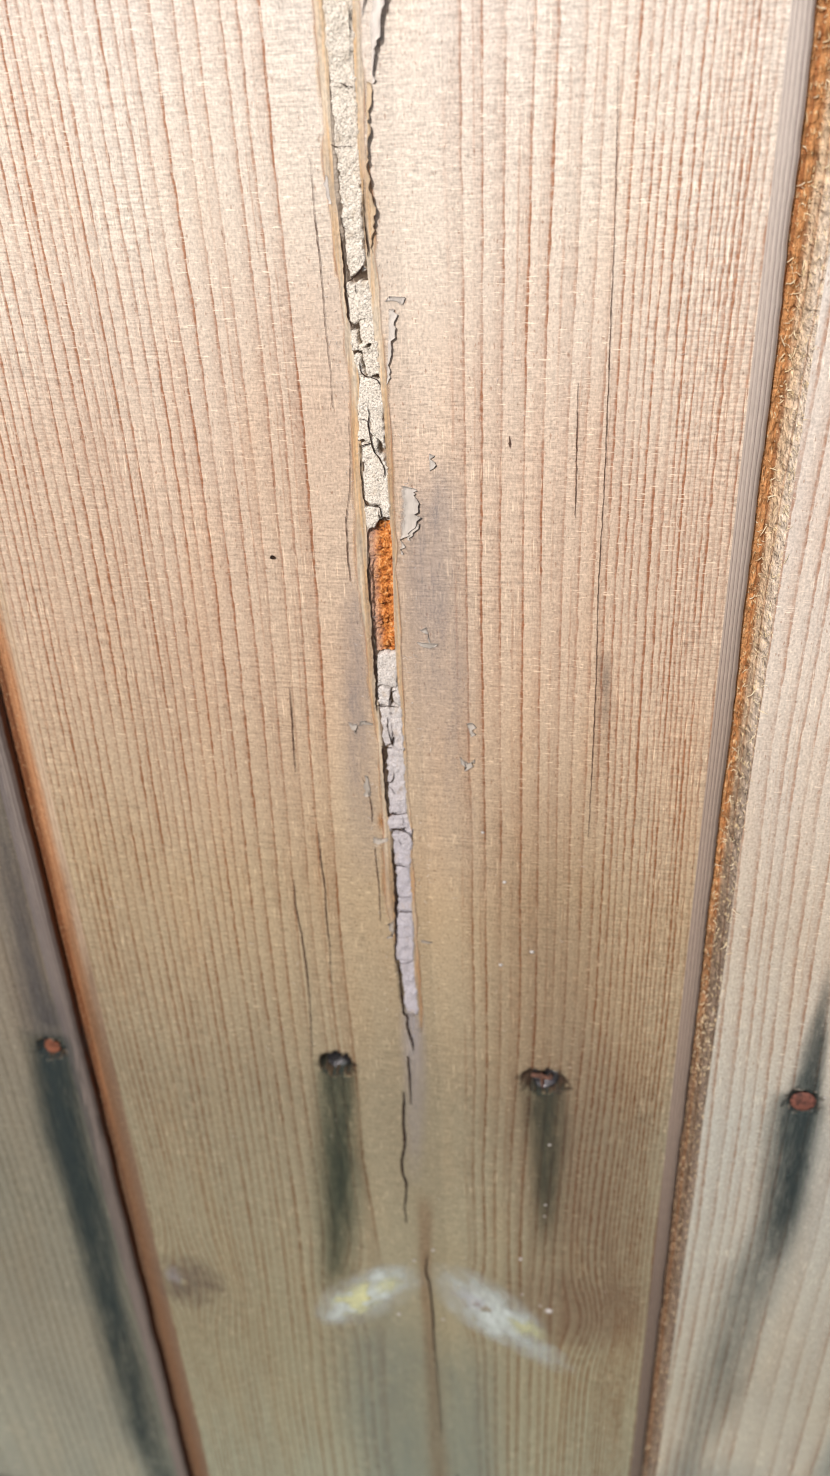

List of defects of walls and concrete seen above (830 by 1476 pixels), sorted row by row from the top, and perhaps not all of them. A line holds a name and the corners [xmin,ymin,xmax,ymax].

crack [304,0,431,1221]
spalling [368,520,395,650]
crack [288,690,296,769]
crack [293,834,331,1055]
crack [425,1256,442,1432]